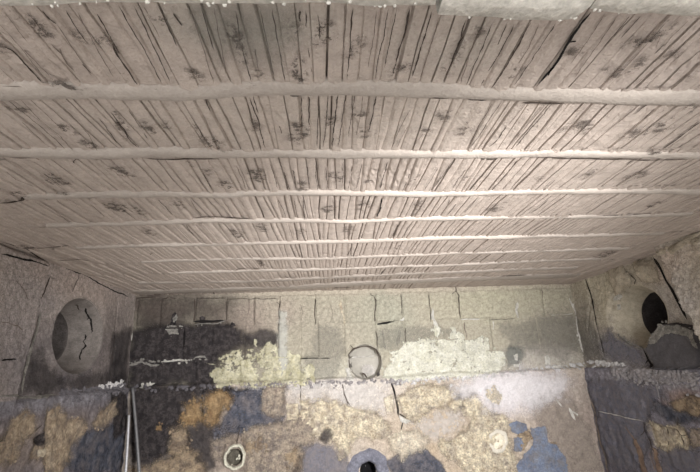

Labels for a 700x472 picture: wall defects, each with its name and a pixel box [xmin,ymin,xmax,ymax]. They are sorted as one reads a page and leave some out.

crack [298,11,320,72]
crack [342,10,353,76]
crack [368,8,410,79]
crack [411,12,439,78]
crack [448,12,641,190]
crack [3,242,175,360]
crack [349,294,406,378]
crack [391,383,407,429]